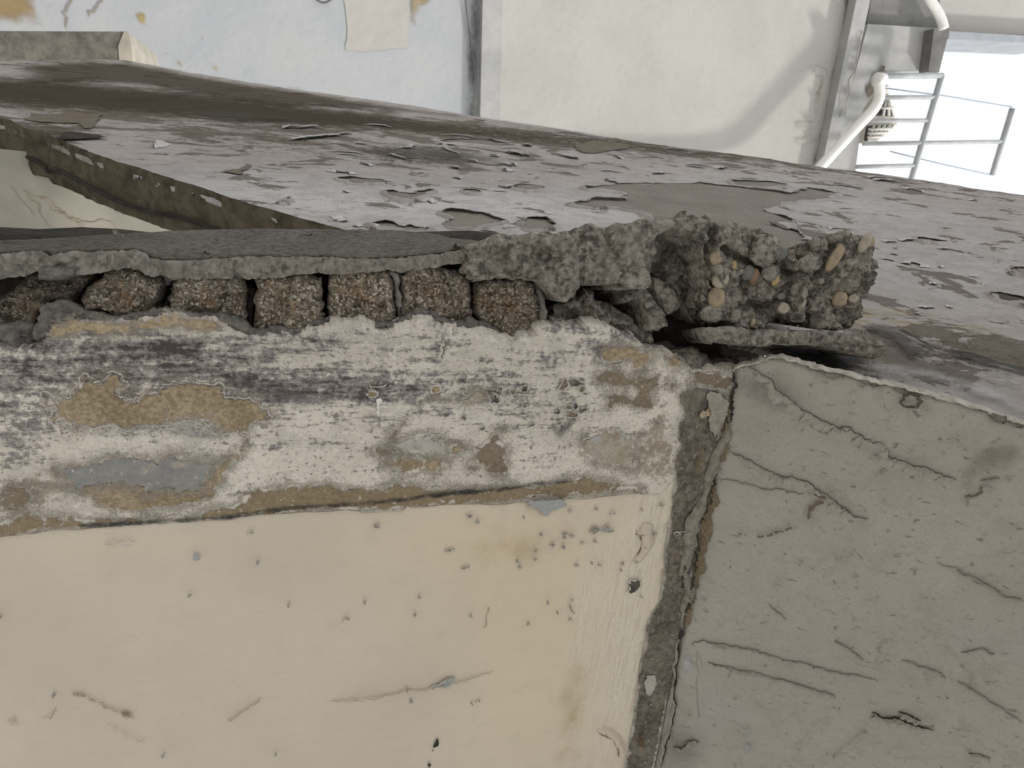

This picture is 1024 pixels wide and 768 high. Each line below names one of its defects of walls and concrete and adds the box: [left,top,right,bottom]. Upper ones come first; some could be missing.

water stain [231,377,343,405]
spalling [0,124,965,768]
crack [659,366,1000,768]
crack [942,565,1024,602]
crack [901,660,1023,724]